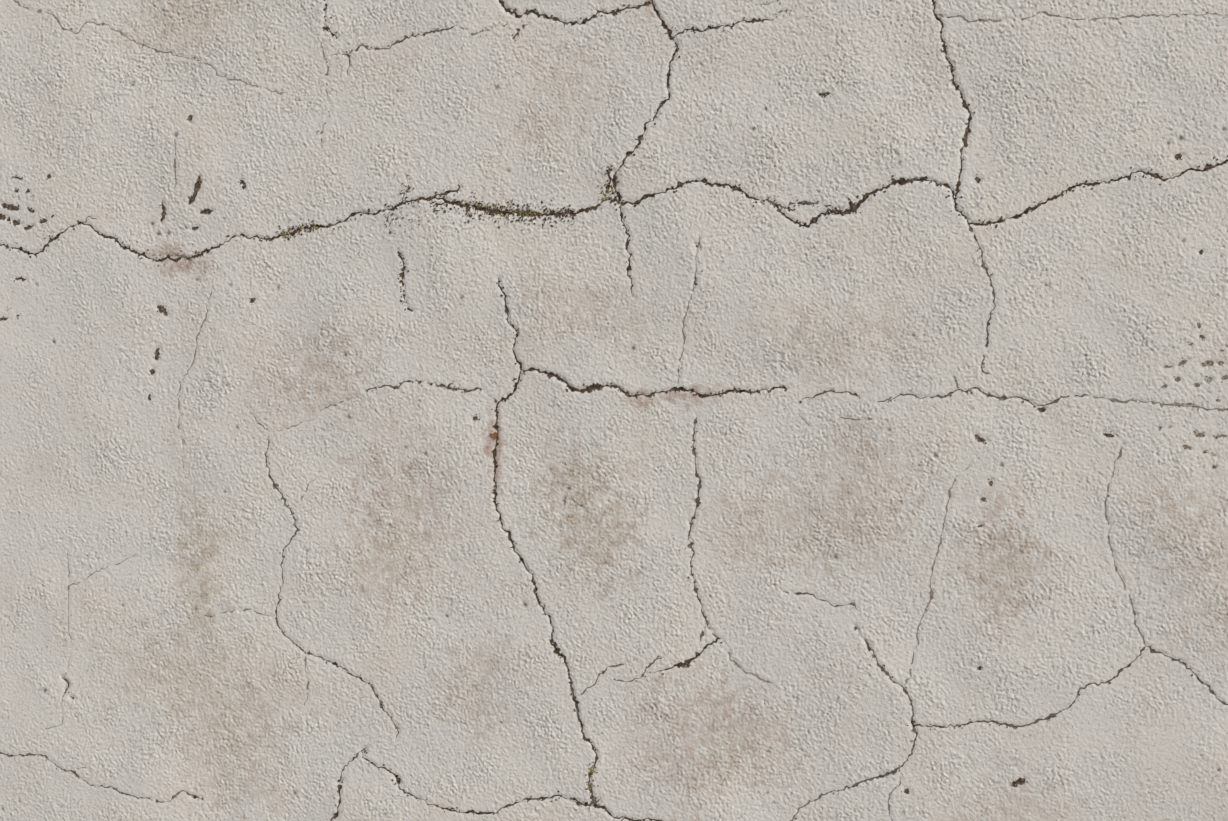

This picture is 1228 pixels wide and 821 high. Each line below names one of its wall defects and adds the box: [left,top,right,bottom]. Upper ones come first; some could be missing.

peeling [0,175,54,231]
crack [0,0,1228,420]
crack [0,552,203,803]
crack [177,290,212,479]
crack [198,401,399,737]
crack [331,240,860,821]
crack [783,448,1228,821]
peeling [1161,323,1205,389]
peeling [1182,431,1227,469]
peeling [1195,349,1228,387]